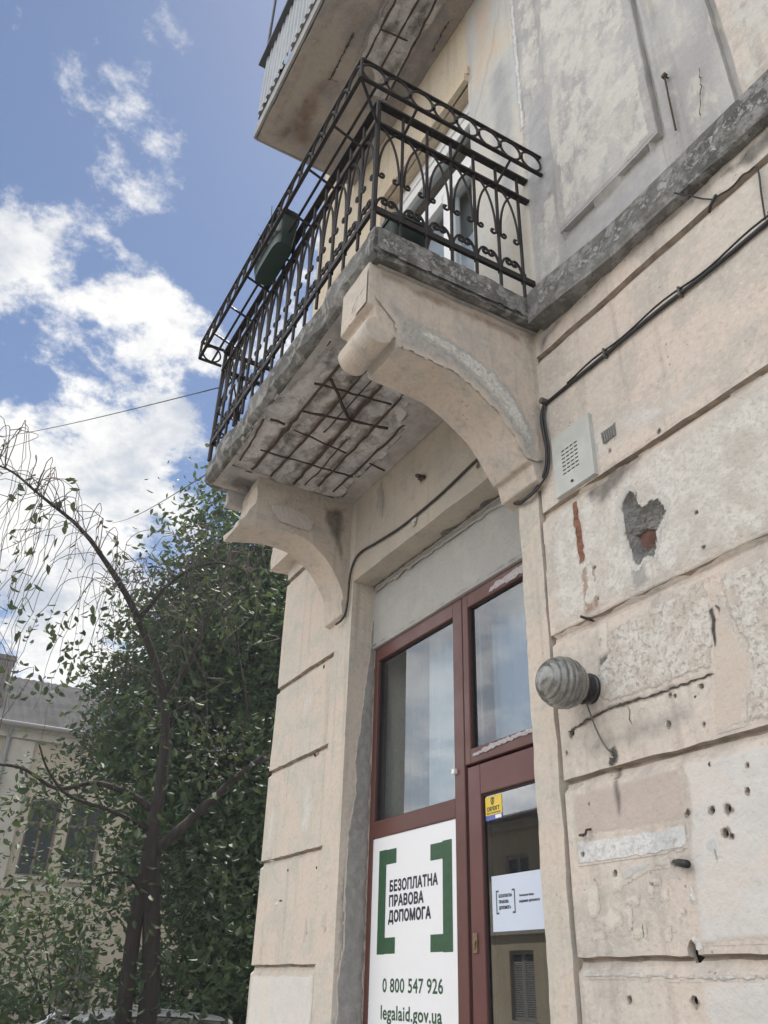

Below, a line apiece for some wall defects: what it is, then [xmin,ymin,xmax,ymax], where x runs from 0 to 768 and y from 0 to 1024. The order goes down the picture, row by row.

spalling [232,341,408,497]
peeling [354,267,768,728]
spalling [688,934,705,963]